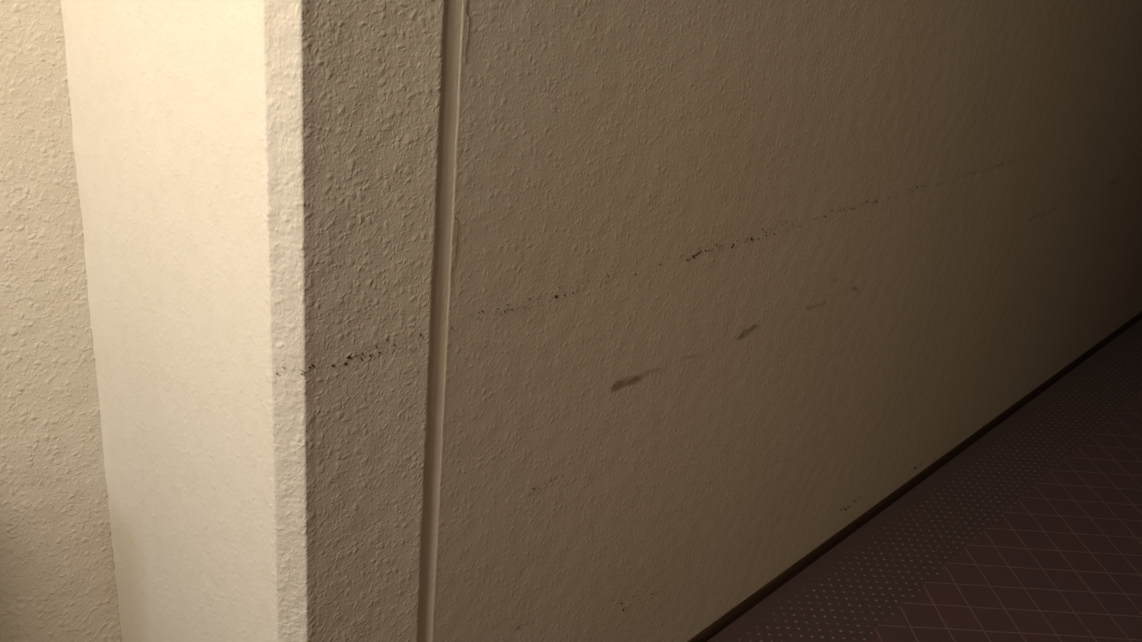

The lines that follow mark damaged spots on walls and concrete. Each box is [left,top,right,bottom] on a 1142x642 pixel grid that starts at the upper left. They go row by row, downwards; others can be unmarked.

crack [464,0,472,54]